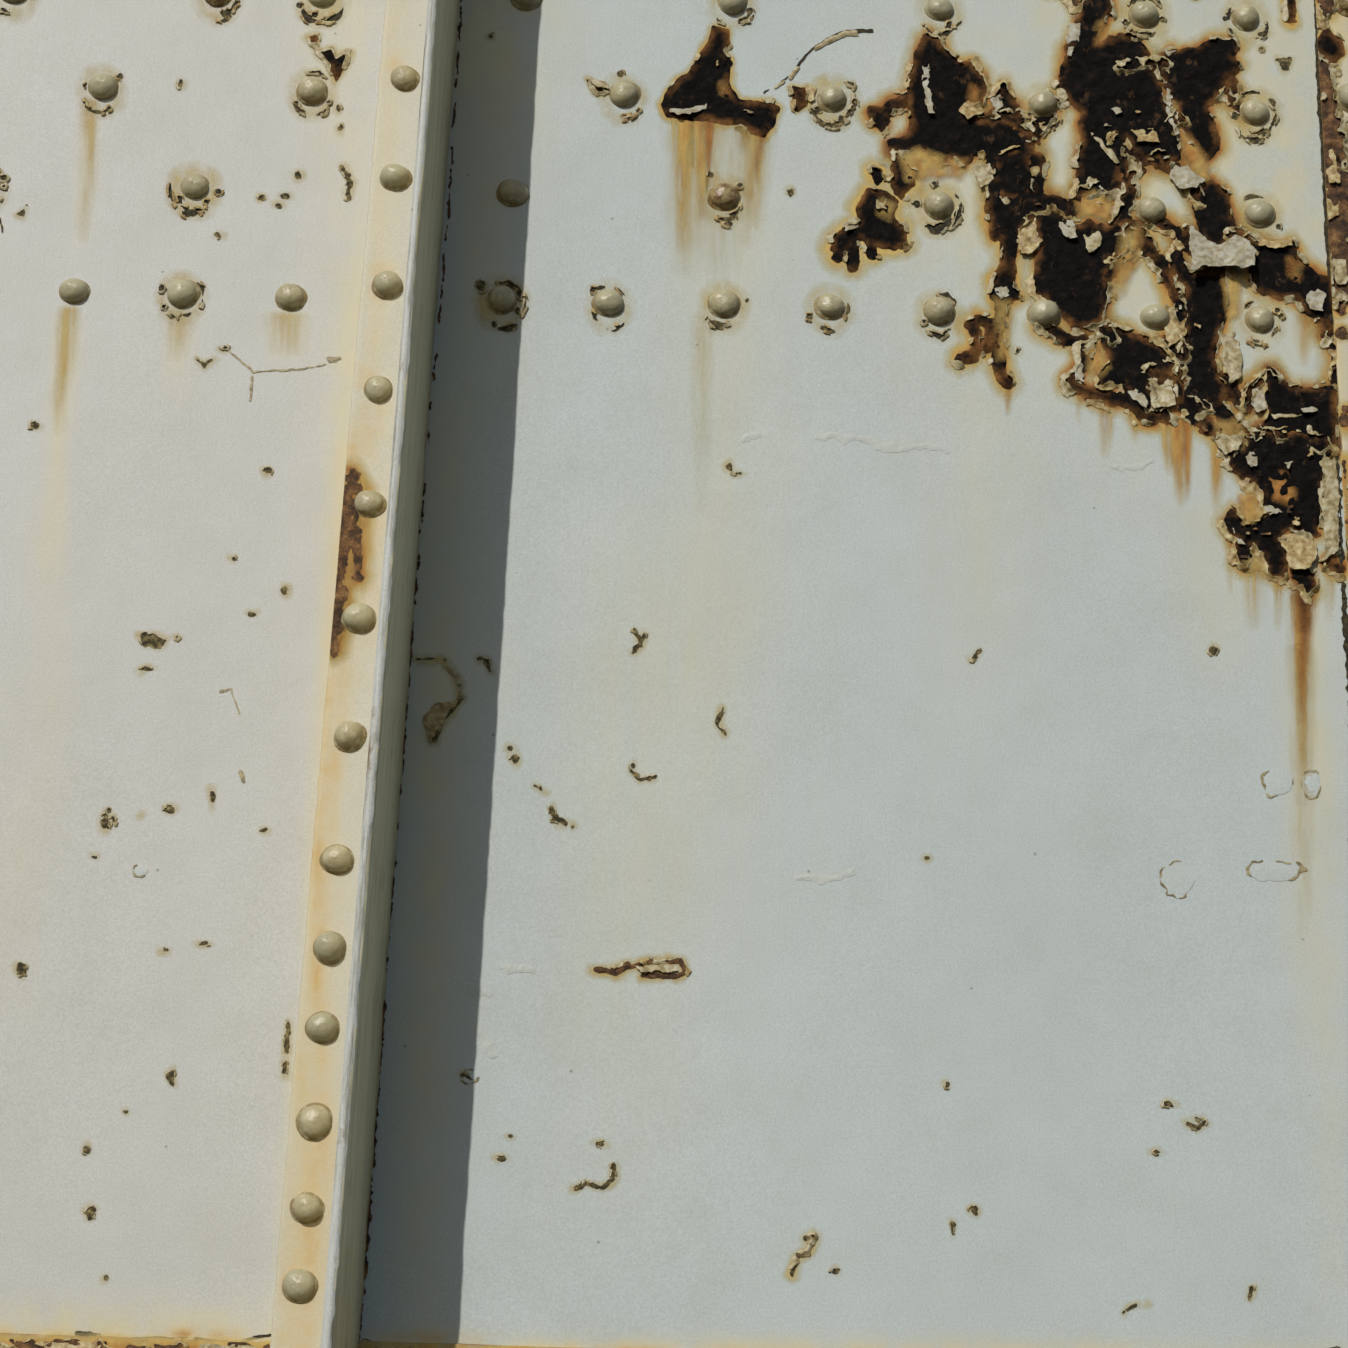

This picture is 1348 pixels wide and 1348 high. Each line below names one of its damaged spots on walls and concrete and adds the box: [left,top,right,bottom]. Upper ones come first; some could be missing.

peeling [1121,0,1167,42]
peeling [1254,20,1292,70]
corrosion [658,25,817,216]
peeling [808,79,860,131]
peeling [1229,89,1280,144]
peeling [911,180,964,234]
peeling [805,303,850,334]
peeling [920,317,951,341]
peeling [1246,306,1286,349]
crack [228,350,341,401]
corrosion [330,462,374,658]
peeling [0,1333,271,1348]